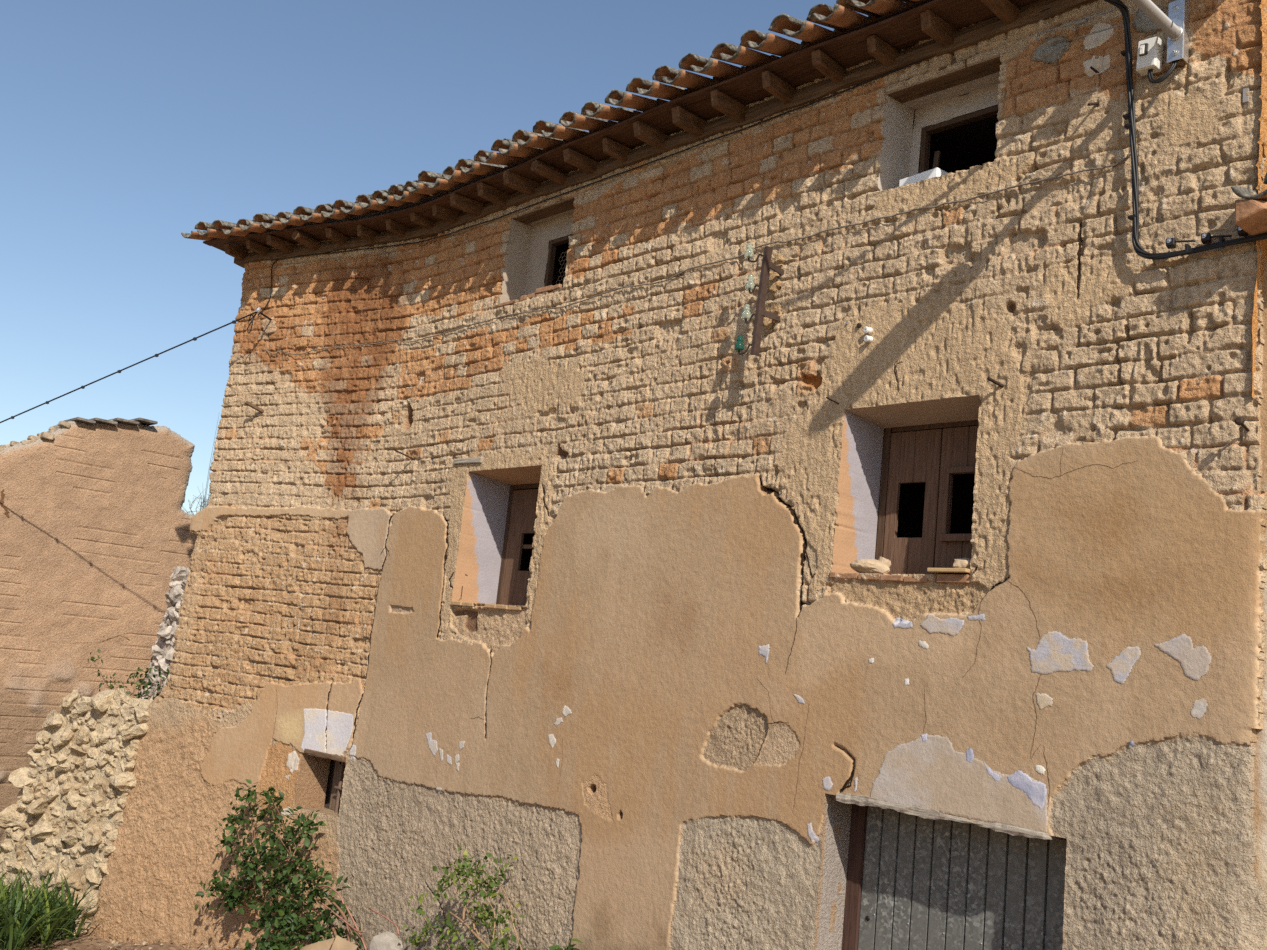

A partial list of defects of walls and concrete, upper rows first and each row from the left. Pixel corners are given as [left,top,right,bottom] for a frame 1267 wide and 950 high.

crack [1015,453,1129,479]
crack [0,489,9,518]
crack [760,478,816,809]
spalling [828,576,989,649]
peeling [1027,631,1211,684]
spalling [702,703,800,771]
crack [836,745,855,793]
peeling [1191,698,1208,719]
spalling [258,705,623,950]
spalling [854,733,1267,950]
spalling [670,815,822,950]